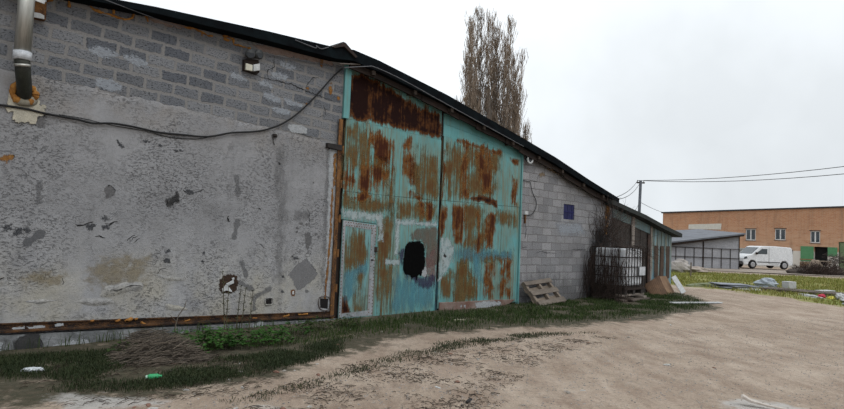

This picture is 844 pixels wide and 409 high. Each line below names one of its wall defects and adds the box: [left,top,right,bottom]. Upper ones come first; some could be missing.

peeling [296,149,338,311]
rust [324,73,519,315]